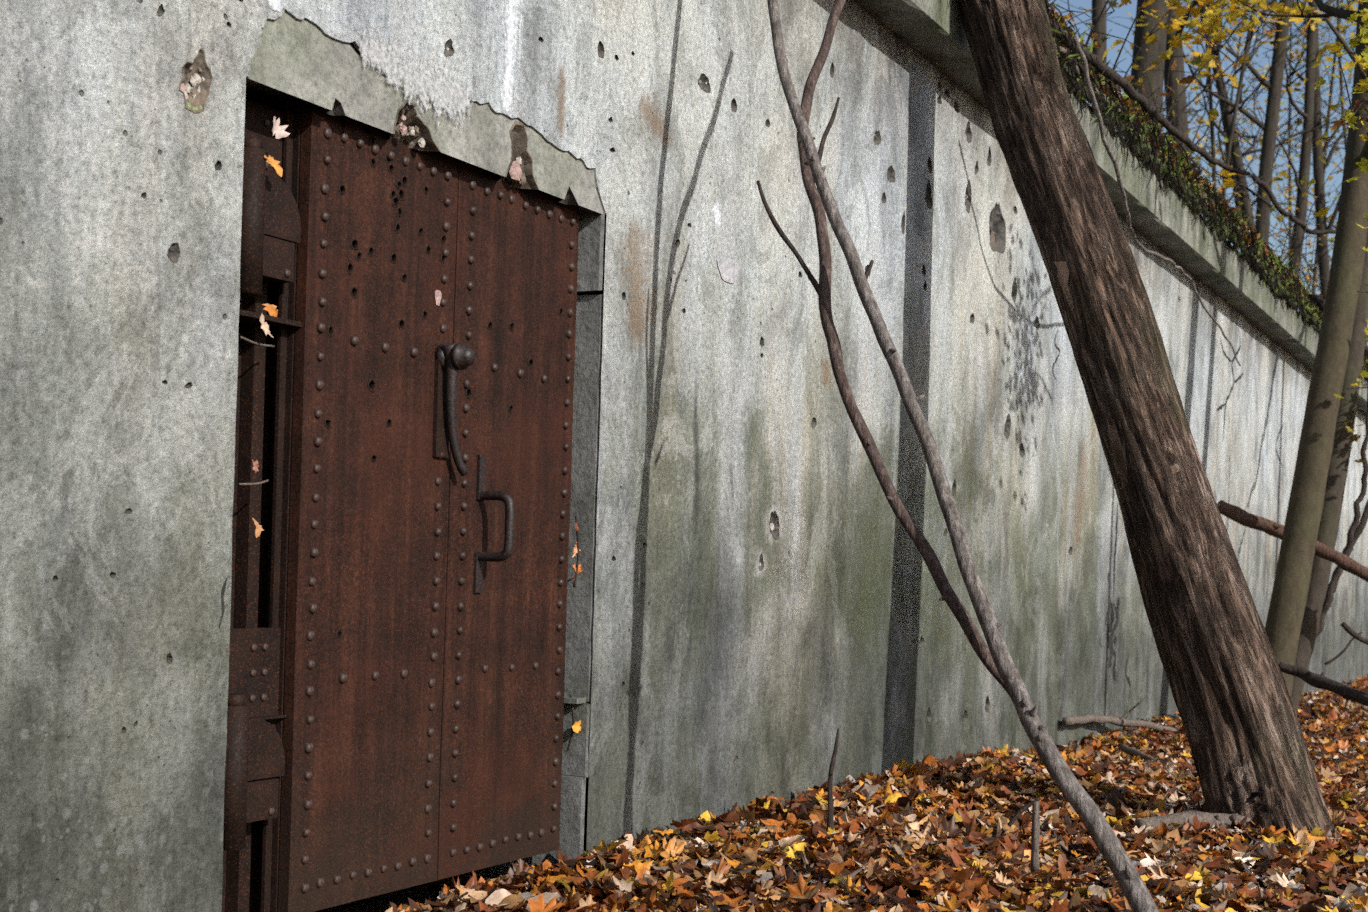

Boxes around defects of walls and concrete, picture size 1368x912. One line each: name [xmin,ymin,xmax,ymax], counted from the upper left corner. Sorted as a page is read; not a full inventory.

spalling [179,48,212,113]
peeling [246,10,606,216]
spalling [990,202,1017,254]
spalling [770,511,780,540]